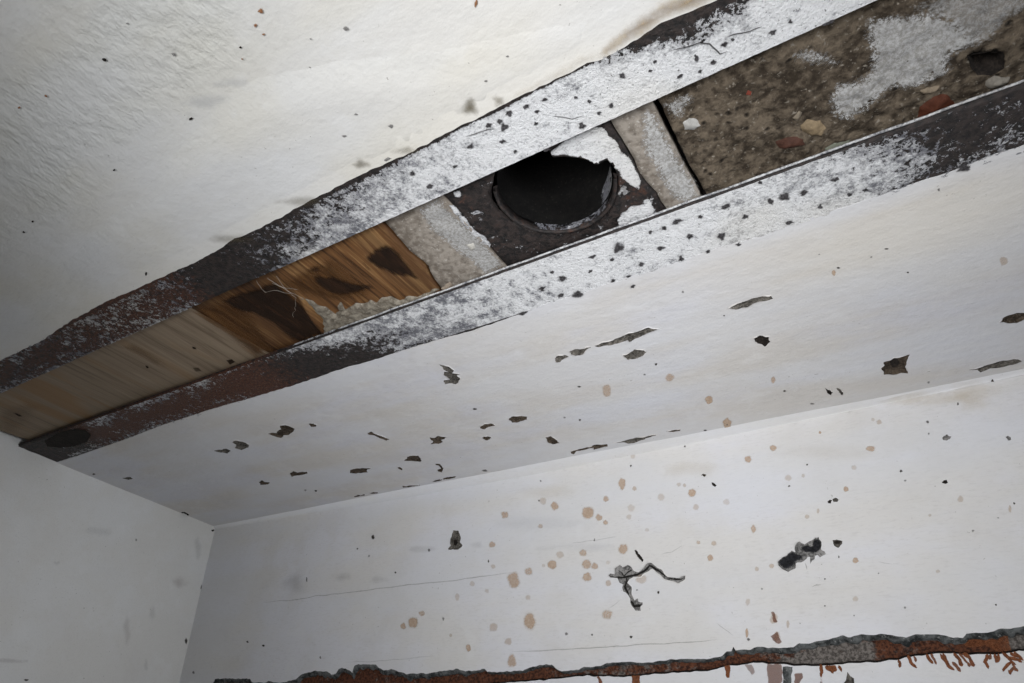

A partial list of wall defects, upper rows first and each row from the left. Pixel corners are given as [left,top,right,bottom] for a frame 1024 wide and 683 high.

peeling [221,0,1024,375]
spalling [439,364,461,384]
spalling [971,359,1024,382]
spalling [570,429,681,454]
leakage [583,507,607,524]
flaking render [448,530,463,551]
flaking render [777,536,842,573]
leakage [508,573,519,587]
leakage [524,614,535,628]
rust [898,636,1023,675]
rust [767,664,803,683]
rust [819,664,842,683]